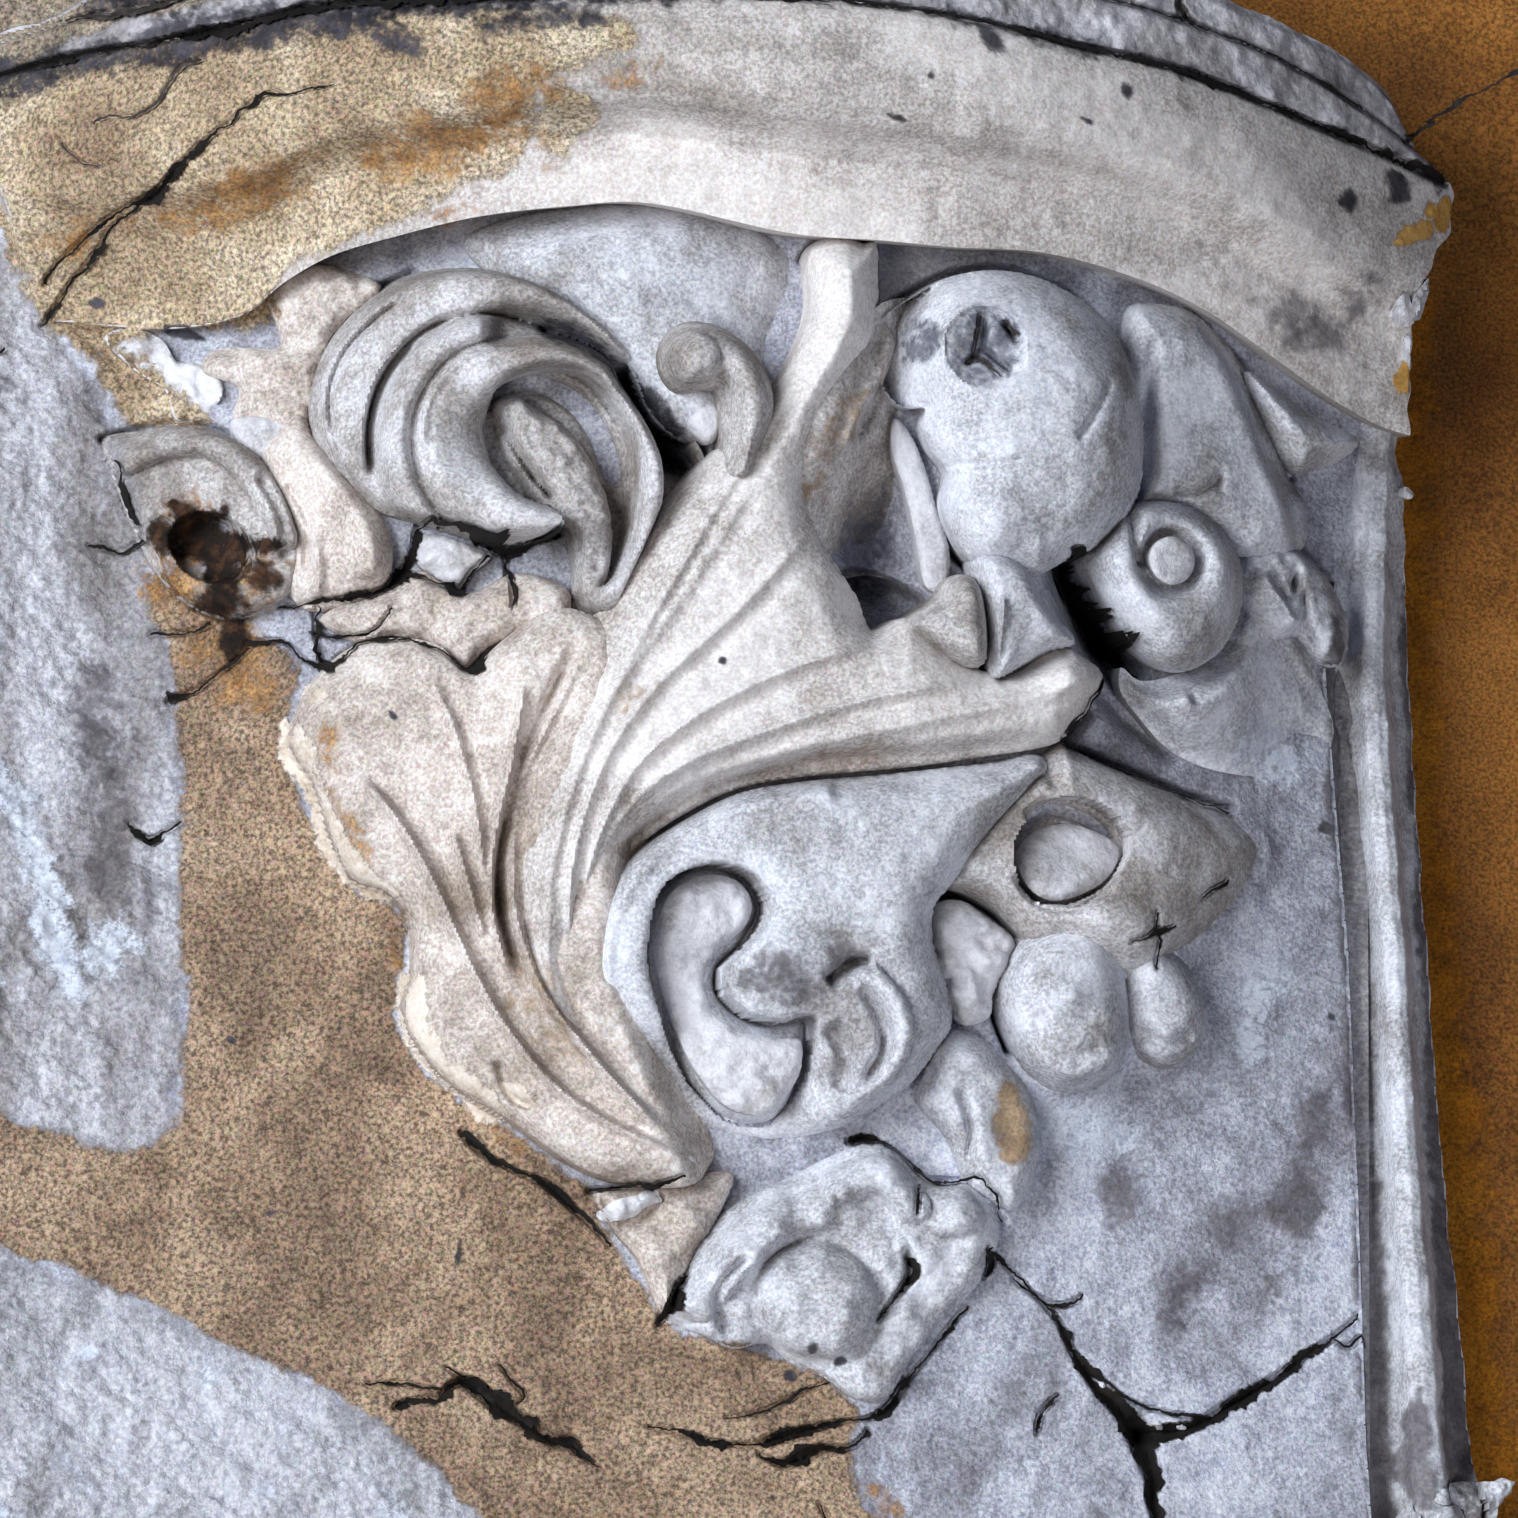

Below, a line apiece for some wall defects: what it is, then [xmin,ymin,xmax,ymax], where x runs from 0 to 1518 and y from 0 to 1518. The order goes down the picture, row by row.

crack [41,83,335,326]
crack [88,460,144,555]
crack [151,621,212,636]
corrosion [138,491,288,713]
crack [165,517,565,705]
spalling [0,0,872,1518]
crack [460,1130,686,1247]
crack [366,1364,601,1467]
crack [647,1132,1366,1518]